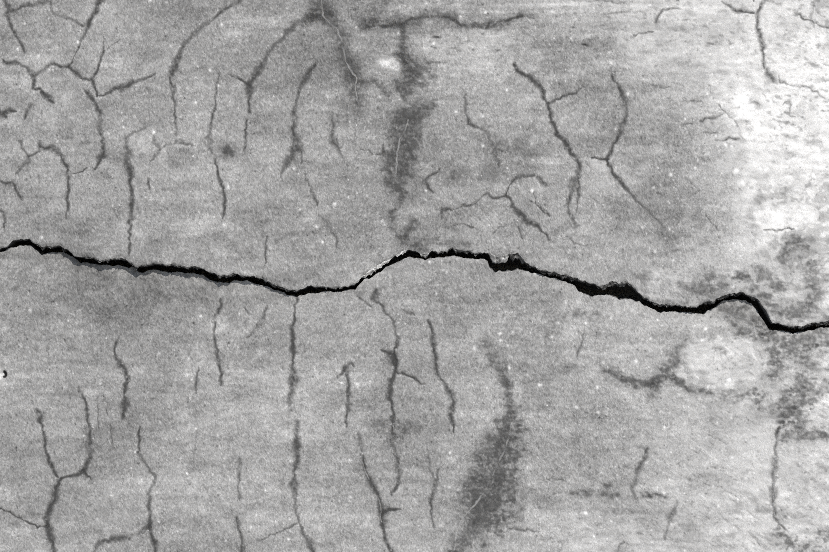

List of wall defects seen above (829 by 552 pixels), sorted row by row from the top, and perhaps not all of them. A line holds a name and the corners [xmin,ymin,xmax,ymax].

crack [0,0,183,124]
leakage [397,19,434,98]
crack [729,0,774,79]
crack [20,133,105,210]
leakage [383,104,435,200]
crack [513,63,634,203]
crack [0,147,829,396]
crack [114,342,140,446]
crack [381,320,455,432]
crack [0,398,92,552]
crack [362,457,400,552]
leakage [449,375,521,552]